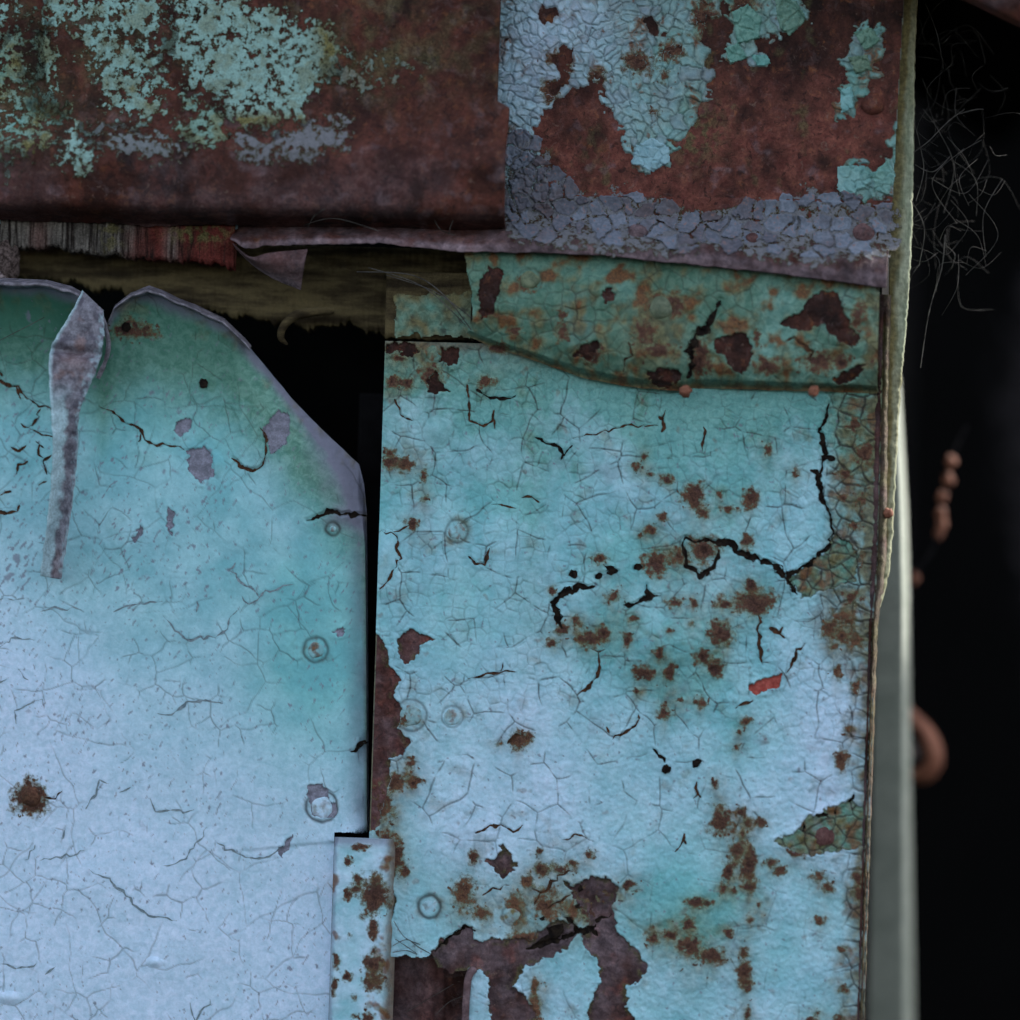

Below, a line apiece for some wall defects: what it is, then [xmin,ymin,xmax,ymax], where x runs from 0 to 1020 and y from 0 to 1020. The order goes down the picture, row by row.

peeling [504,0,903,270]
crack [0,372,53,515]
peeling [186,446,215,483]
rust [631,452,760,519]
crack [681,403,836,595]
crack [550,563,661,629]
rust [690,578,779,679]
peeling [749,673,782,695]
crack [756,615,805,673]
peeling [775,801,866,857]
rust [331,756,426,1020]
rust [644,804,805,1020]